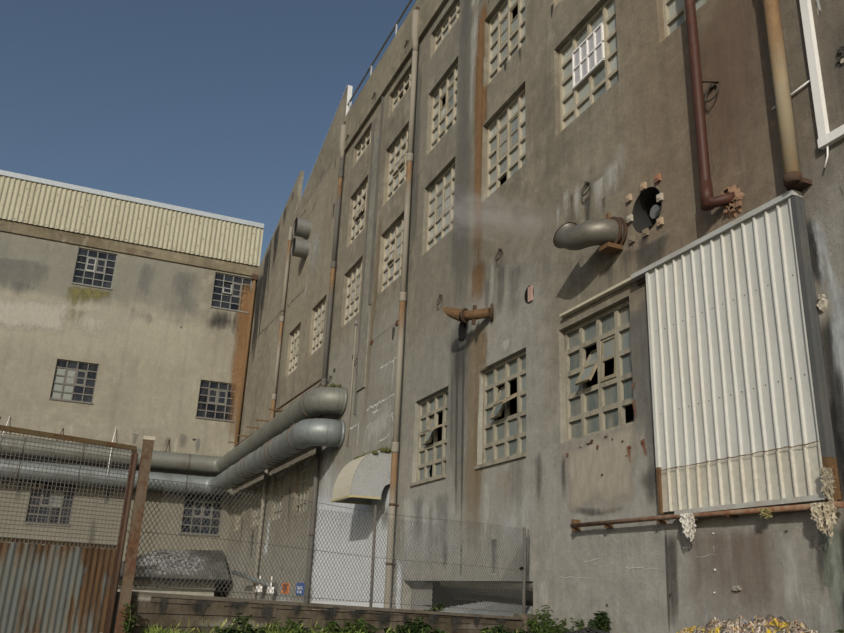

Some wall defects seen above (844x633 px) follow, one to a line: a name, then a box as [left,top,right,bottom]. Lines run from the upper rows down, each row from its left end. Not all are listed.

corrosion [474,5,487,253]
corrosion [232,287,256,427]
water stain [807,221,844,497]
water stain [818,528,844,623]